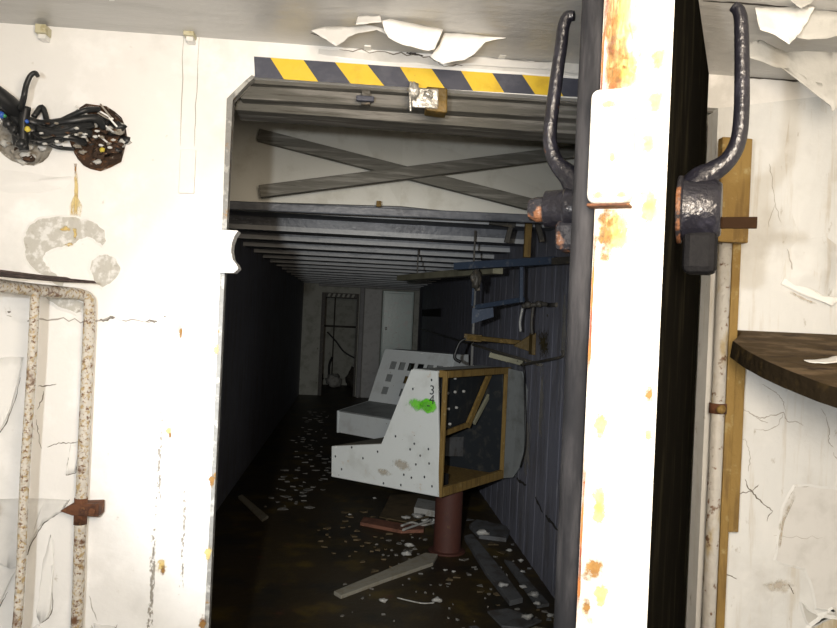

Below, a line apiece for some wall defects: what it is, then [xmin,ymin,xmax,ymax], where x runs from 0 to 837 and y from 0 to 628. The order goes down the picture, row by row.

peeling [311,15,552,76]
peeling [563,63,579,78]
corrosion [600,0,645,90]
peeling [750,0,837,112]
peeling [21,214,124,290]
peeling [0,356,23,432]
peeling [66,444,78,475]
corrosion [594,415,607,437]
crack [740,384,819,539]
peeling [27,498,69,555]
corrosion [577,471,608,614]
peeling [773,484,837,628]